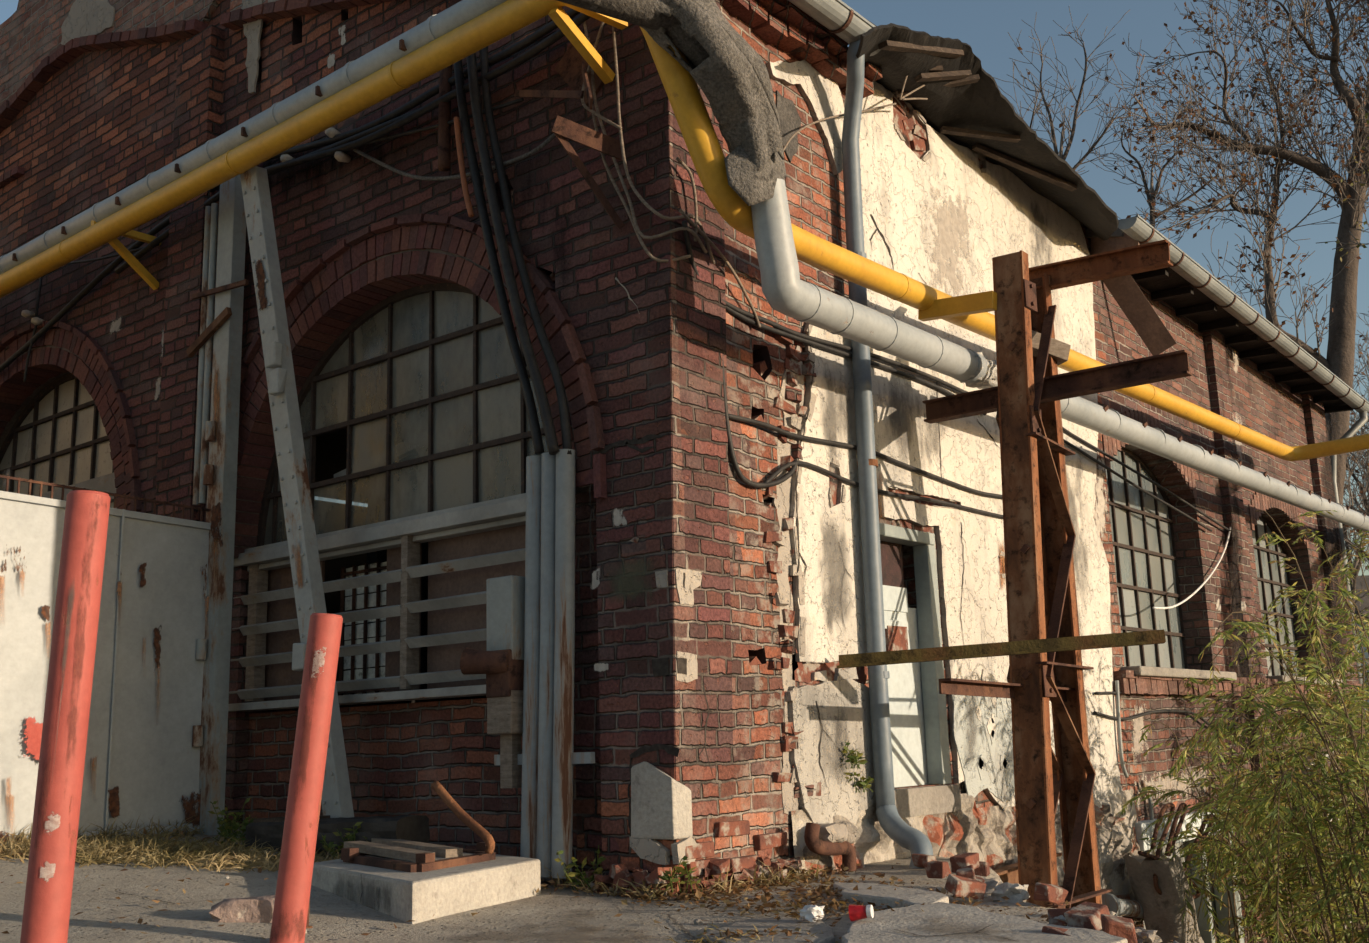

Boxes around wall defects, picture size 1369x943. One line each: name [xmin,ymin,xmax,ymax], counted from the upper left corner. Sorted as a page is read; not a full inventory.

spalling [892,92,931,162]
corrosion [0,545,27,601]
corrosion [139,563,147,587]
corrosion [201,502,223,618]
spalling [748,323,868,816]
corrosion [41,605,50,642]
corrosion [143,625,162,695]
corrosion [0,778,20,843]
corrosion [108,786,120,818]